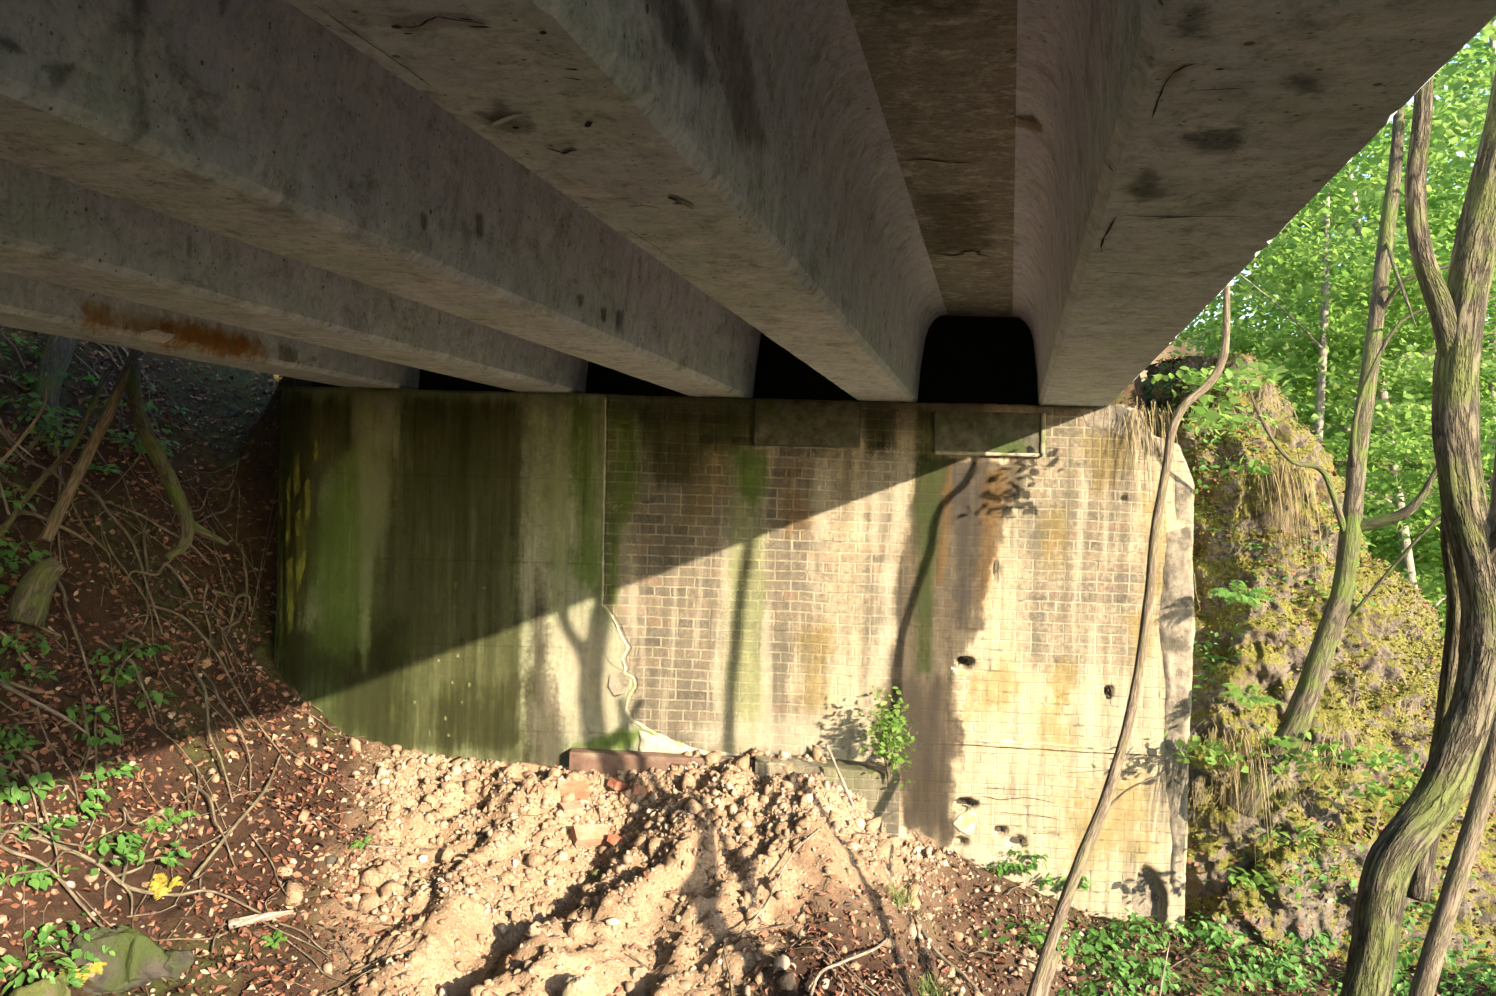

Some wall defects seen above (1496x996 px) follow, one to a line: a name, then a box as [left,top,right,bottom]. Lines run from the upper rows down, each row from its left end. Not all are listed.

rust [81,304,266,362]
water stain [324,391,396,669]
water stain [520,400,645,768]
water stain [684,444,1027,847]